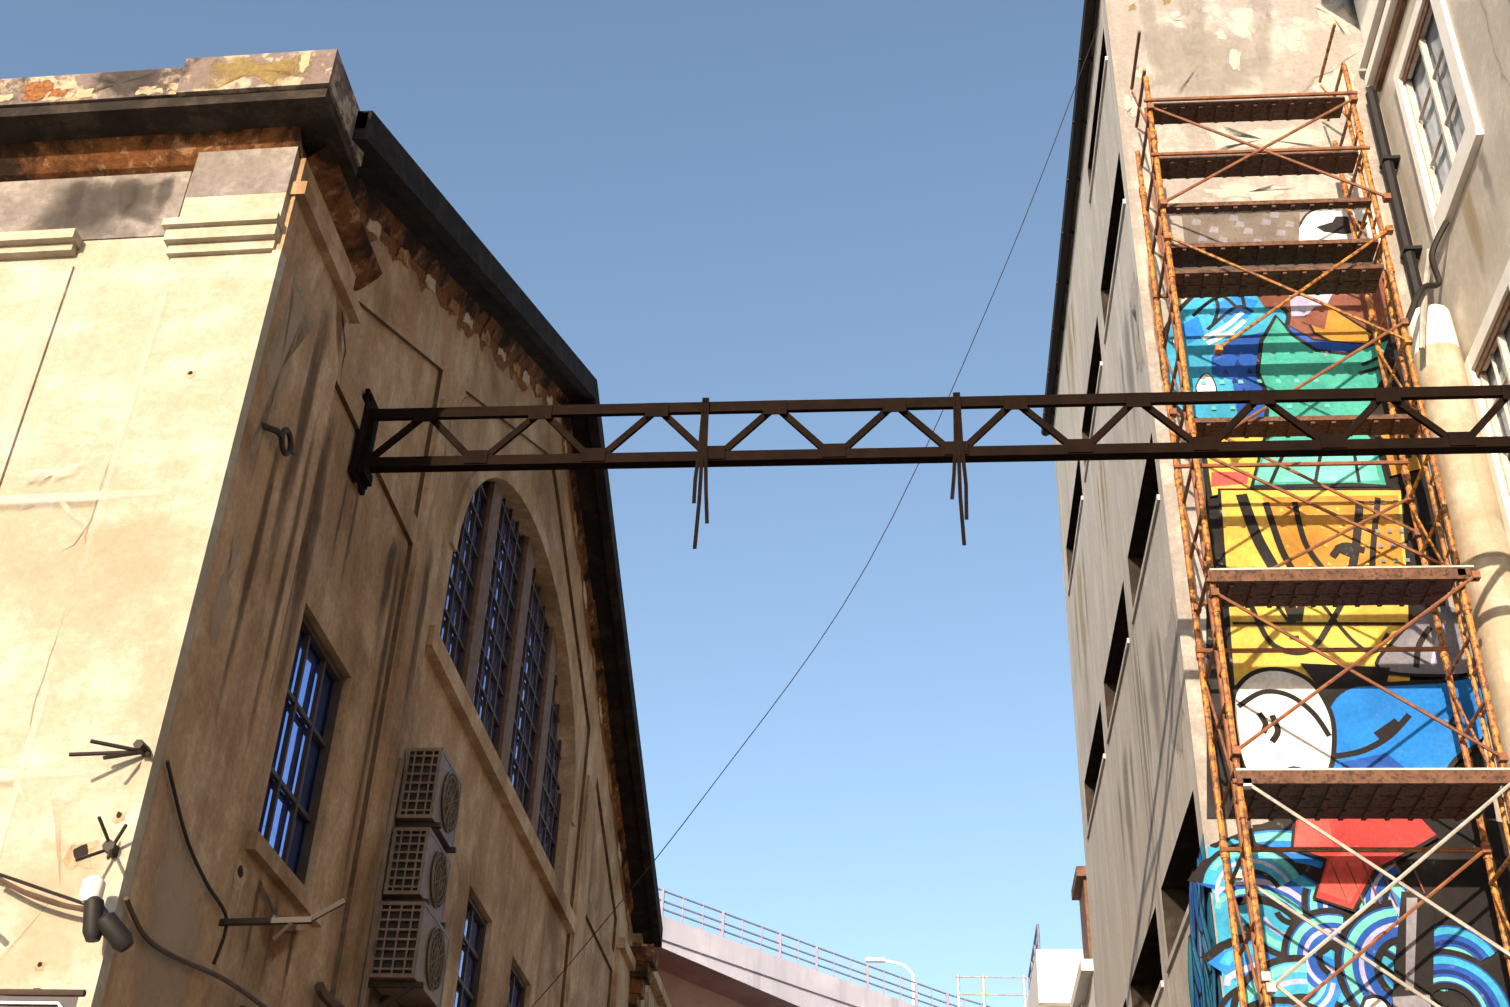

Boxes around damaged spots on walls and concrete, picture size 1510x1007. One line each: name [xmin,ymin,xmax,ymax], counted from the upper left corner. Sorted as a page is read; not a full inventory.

flaking render [1169,4,1259,71]
flaking render [1316,0,1358,36]
flaking render [42,88,94,101]
flaking render [135,83,178,95]
flaking render [1287,53,1359,98]
water stain [413,565,429,658]
water stain [365,547,397,764]